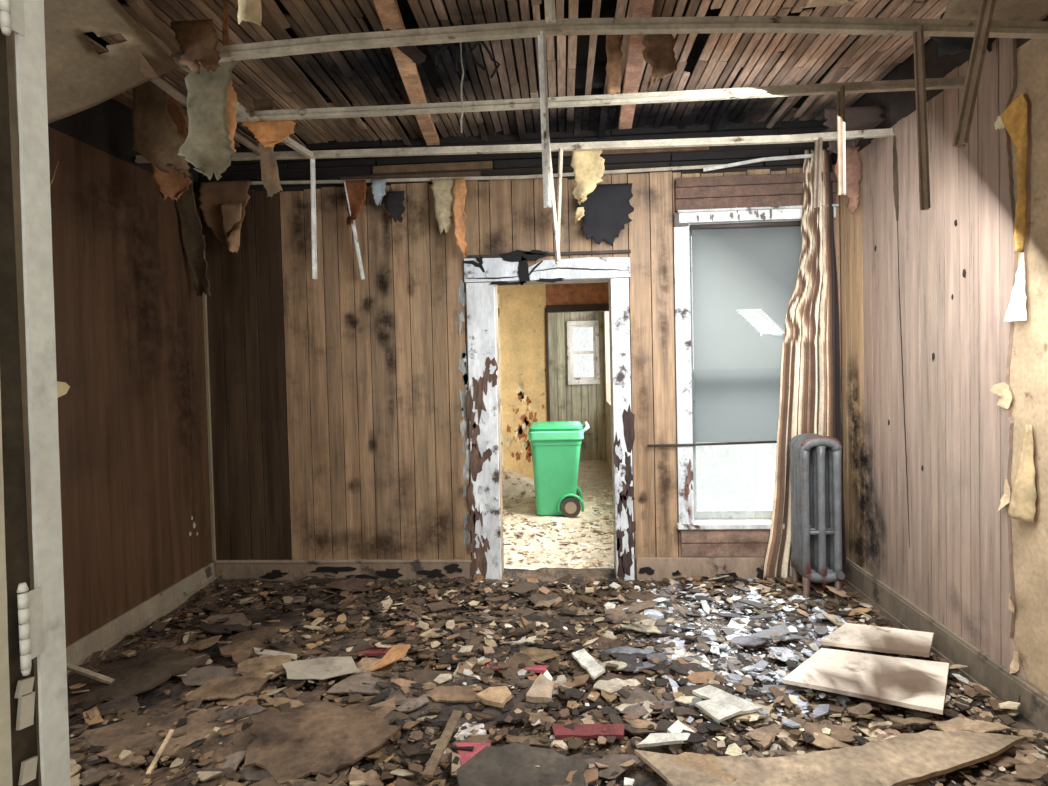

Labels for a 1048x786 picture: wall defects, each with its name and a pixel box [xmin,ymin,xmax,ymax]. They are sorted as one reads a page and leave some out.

peeling [416,280,499,579]
peeling [613,403,636,578]
leakage [849,373,883,568]
flaking render [995,39,1048,697]